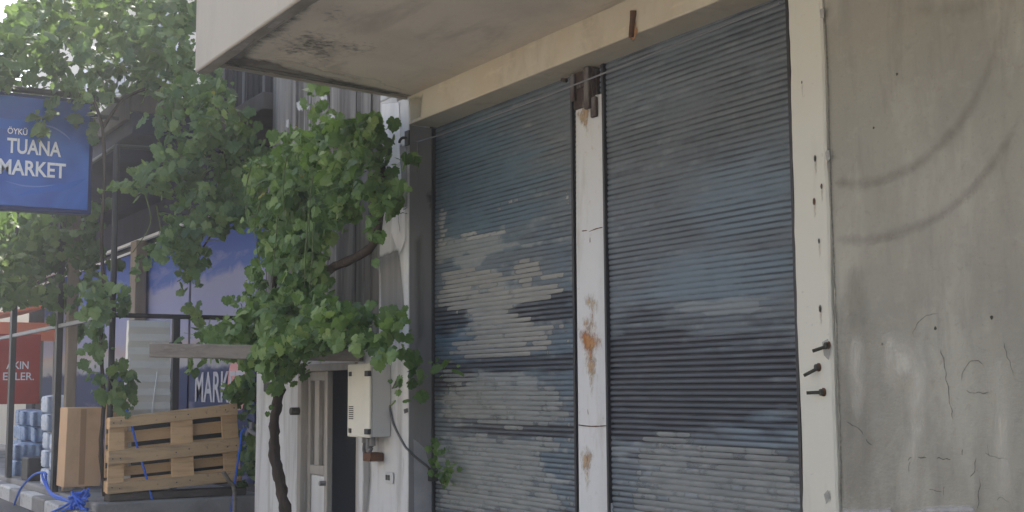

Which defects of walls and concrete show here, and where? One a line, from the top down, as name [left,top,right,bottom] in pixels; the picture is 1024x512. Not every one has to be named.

corrosion [582,298,599,380]
crack [908,446,1000,508]